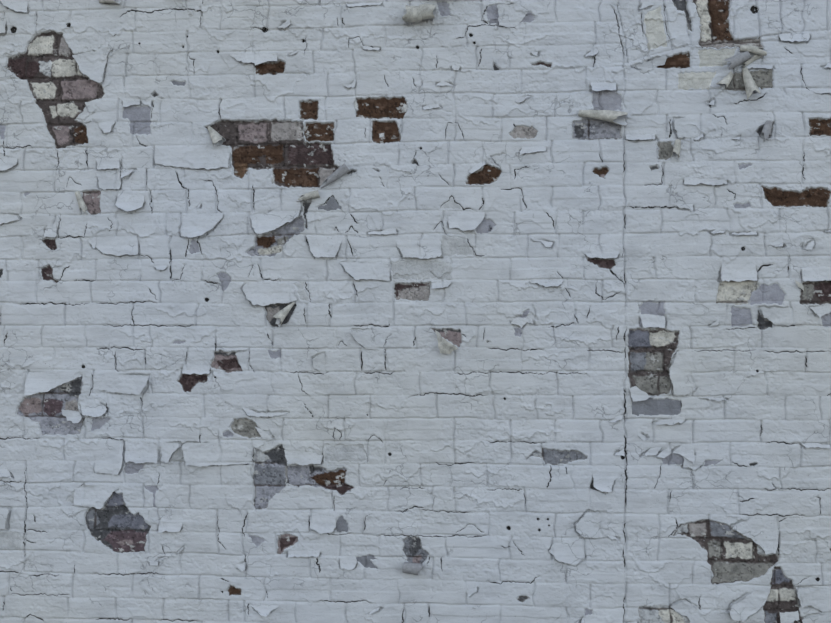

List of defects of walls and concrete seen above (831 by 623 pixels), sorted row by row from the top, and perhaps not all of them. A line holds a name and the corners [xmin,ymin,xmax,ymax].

peeling [6,23,117,149]
peeling [354,97,408,144]
peeling [633,0,773,100]
peeling [155,100,356,257]
peeling [761,186,831,208]
peeling [716,262,831,330]
peeling [17,365,110,435]
peeling [178,350,250,392]
peeling [609,301,726,423]
peeling [223,407,354,509]
peeling [67,484,151,553]
peeling [673,517,831,623]